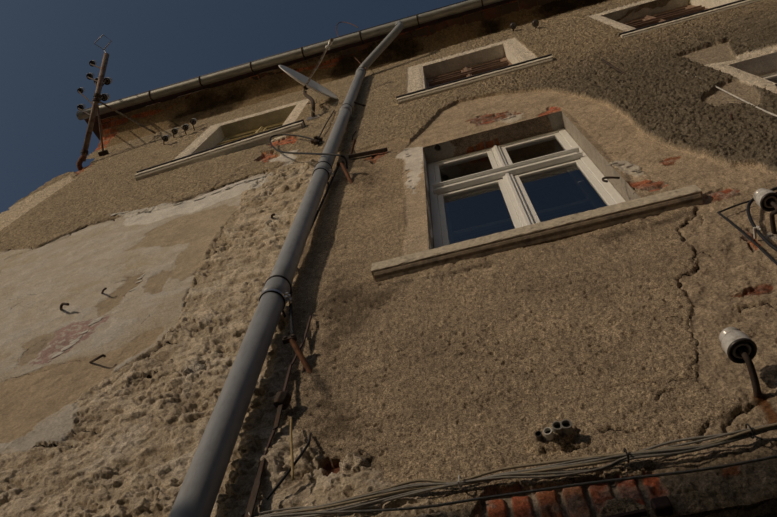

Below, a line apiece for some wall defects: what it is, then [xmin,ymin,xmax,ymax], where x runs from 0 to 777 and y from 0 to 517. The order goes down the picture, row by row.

flaking render [465,110,525,126]
flaking render [537,106,564,131]
peeling [255,136,299,166]
flaking render [607,160,669,192]
peeling [0,172,273,453]
crack [594,209,711,400]
flaking render [732,283,776,298]
crack [699,405,758,444]
flaking render [469,469,671,517]